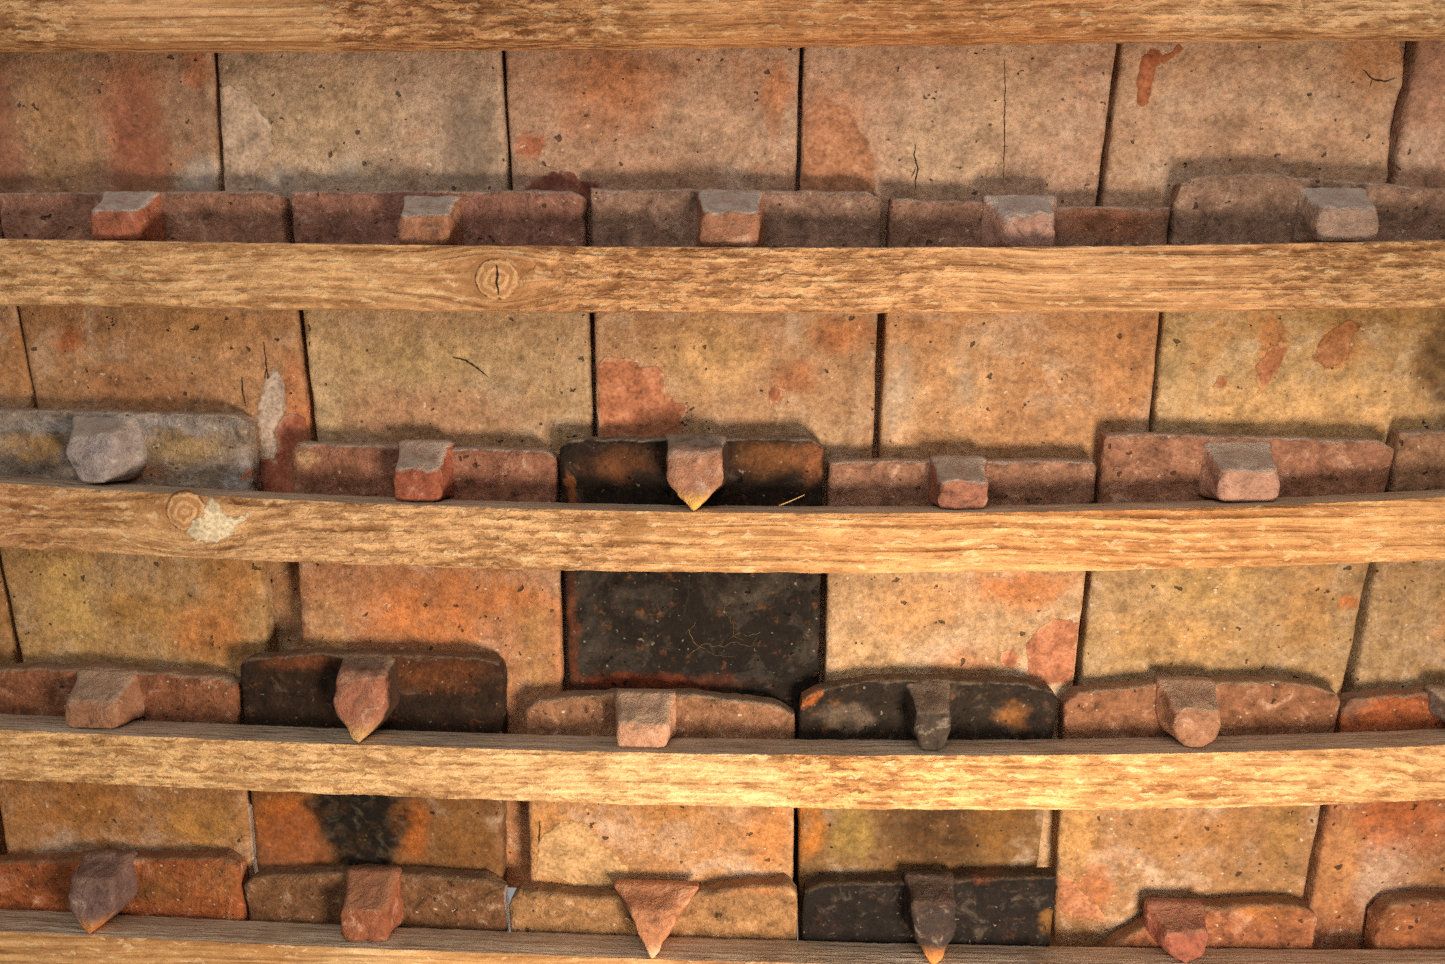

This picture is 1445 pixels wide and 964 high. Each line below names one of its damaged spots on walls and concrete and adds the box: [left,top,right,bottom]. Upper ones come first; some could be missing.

peeling [256,370,308,493]